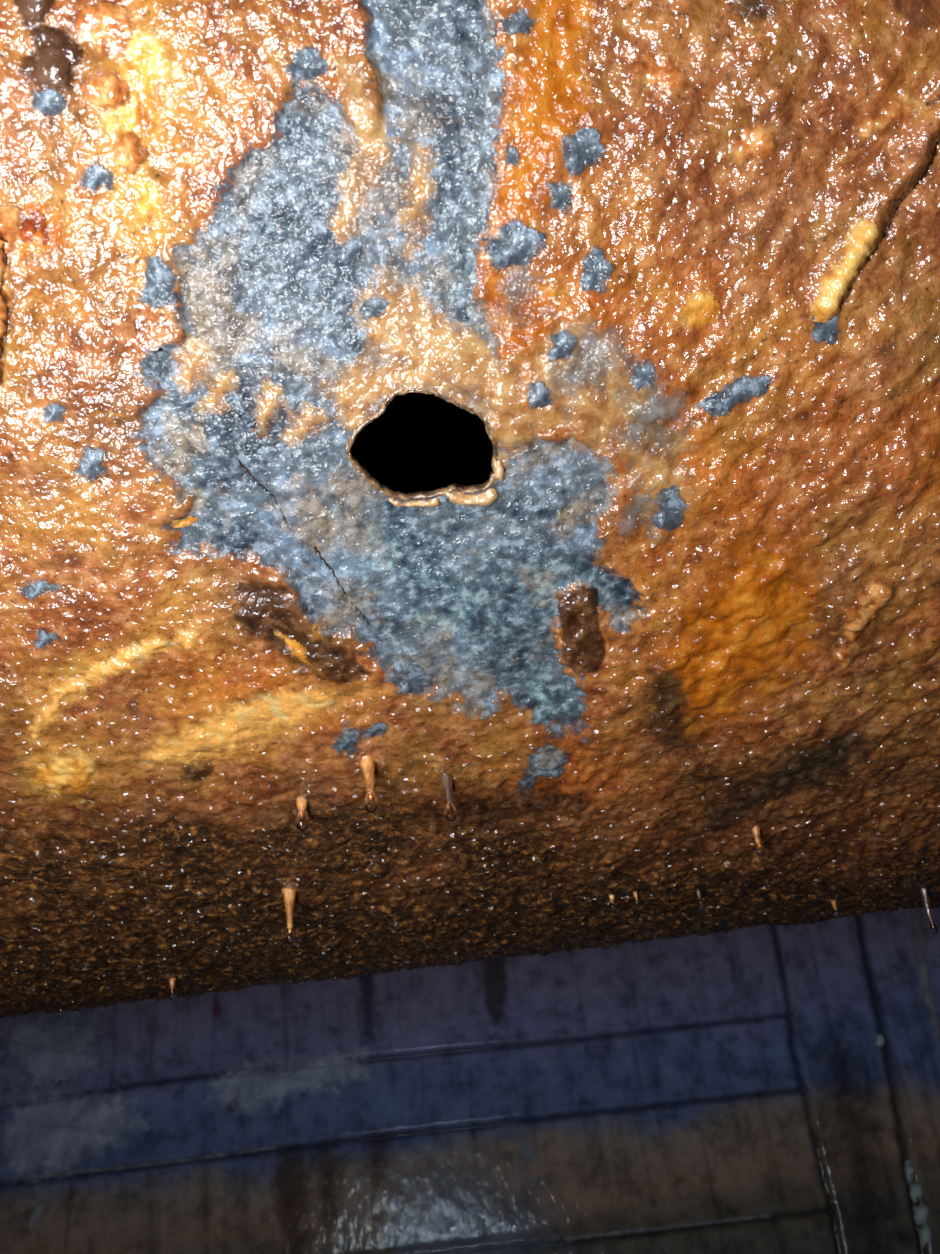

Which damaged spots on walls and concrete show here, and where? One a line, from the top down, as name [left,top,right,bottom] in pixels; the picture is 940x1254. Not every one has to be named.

rust [104,26,180,137]
rust [0,203,62,384]
rust [811,220,880,323]
crack [839,138,940,307]
rust [134,0,695,831]
peeling [389,459,505,507]
rust [27,627,201,740]
water stain [648,670,686,747]
rust [646,547,819,733]
rust [834,577,894,668]
water stain [708,734,862,830]
water stain [905,1160,932,1246]